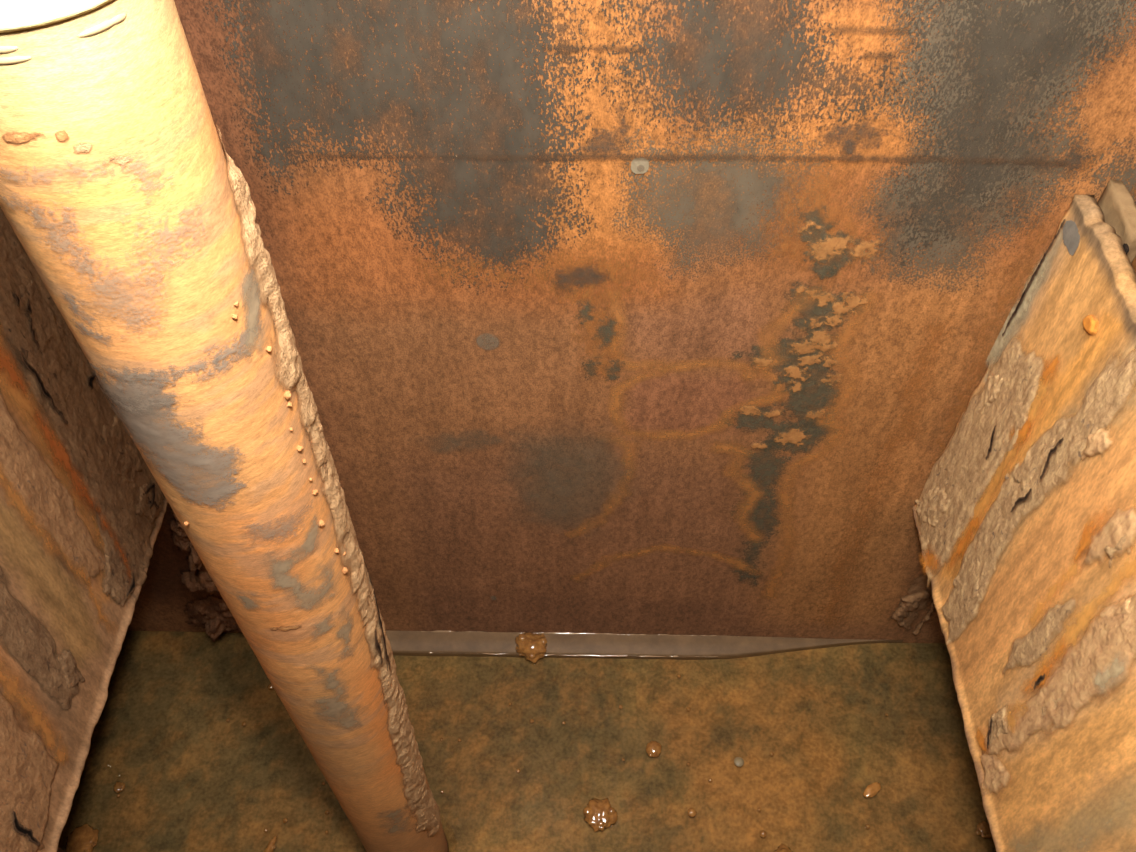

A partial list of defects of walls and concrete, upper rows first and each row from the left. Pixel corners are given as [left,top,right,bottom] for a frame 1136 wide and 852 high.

water stain [1,196,207,347]
corrosion [0,207,242,642]
water stain [89,270,262,511]
corrosion [215,122,444,837]
corrosion [576,296,622,381]
water stain [203,0,1136,610]
crack [985,425,996,460]
corrosion [891,337,1136,646]
crack [1011,438,1064,512]
crack [12,811,40,846]
corrosion [0,567,85,852]